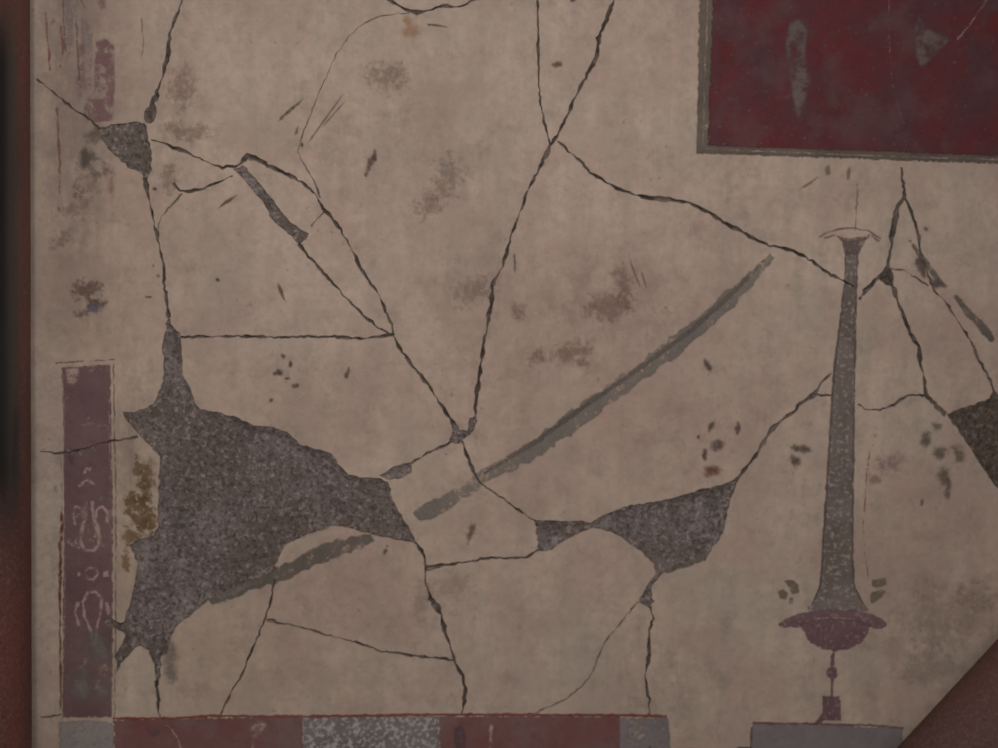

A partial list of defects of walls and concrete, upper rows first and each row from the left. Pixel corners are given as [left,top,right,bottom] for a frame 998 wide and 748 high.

crack [36,78,99,128]
spalling [99,122,152,178]
spalling [233,165,309,245]
crack [143,0,995,523]
crack [41,436,138,455]
spalling [947,391,998,488]
spalling [103,316,417,683]
spalling [535,480,736,607]
crack [220,541,539,715]
crack [530,601,655,716]
crack [154,679,181,748]